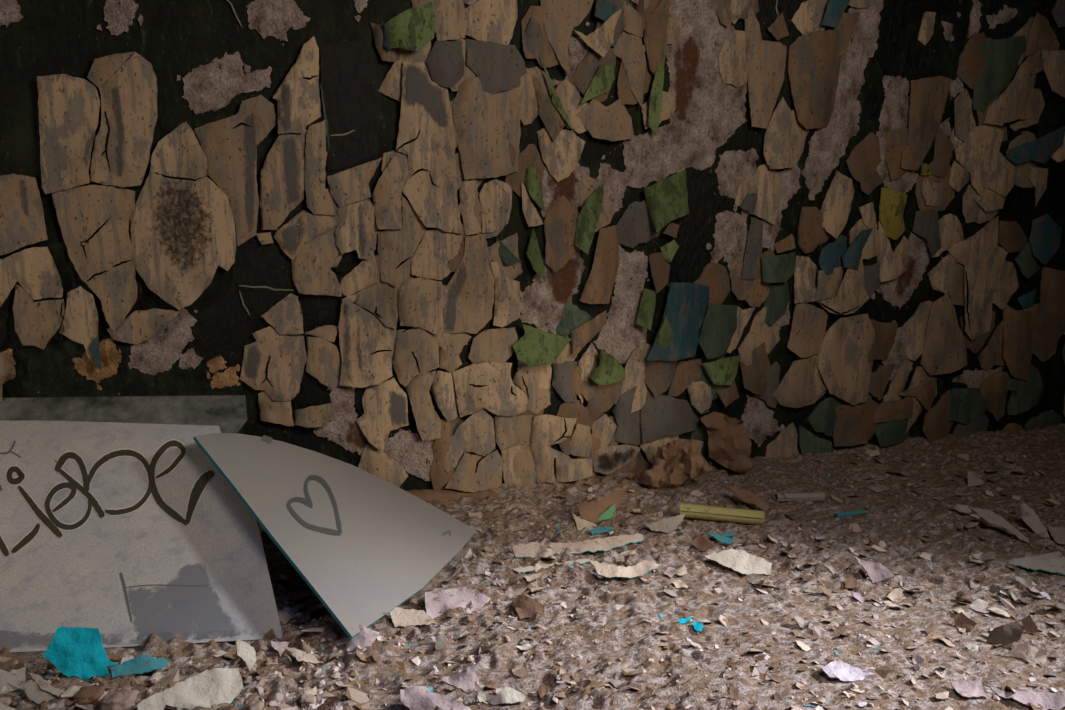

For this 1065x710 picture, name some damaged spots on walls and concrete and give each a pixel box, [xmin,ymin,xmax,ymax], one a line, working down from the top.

crack [80,217,132,281]
damp [155,183,213,269]
peeling [0,0,1065,492]
peeling [512,490,685,579]
peeling [690,532,772,576]
peeling [855,557,895,584]
peeling [1008,503,1065,575]